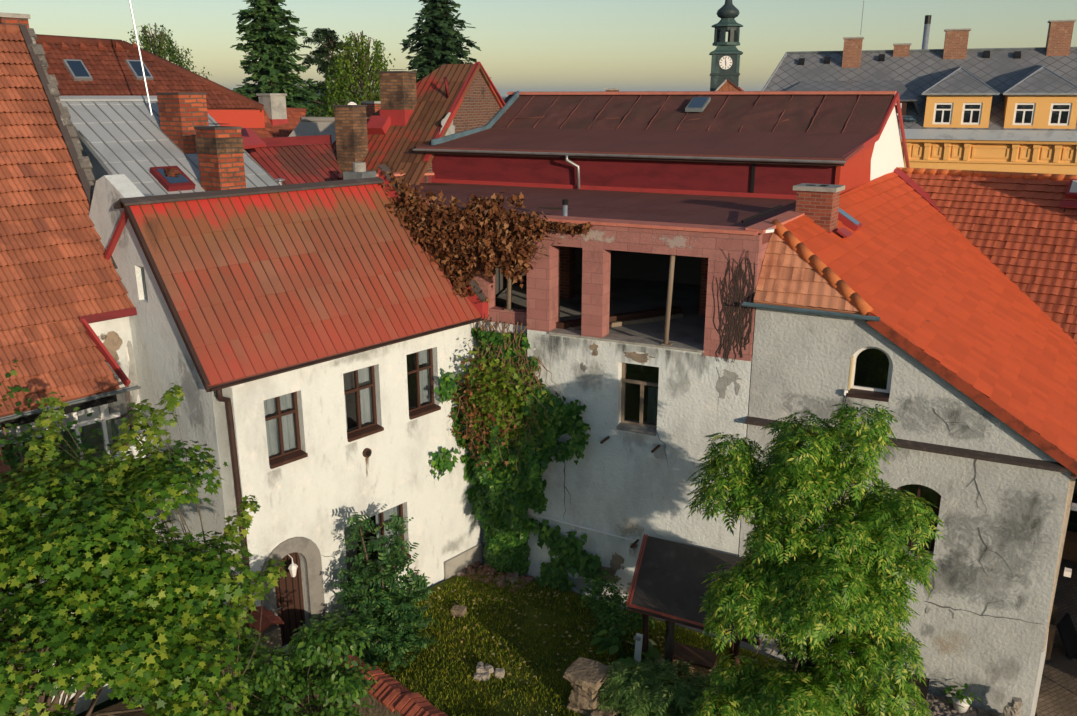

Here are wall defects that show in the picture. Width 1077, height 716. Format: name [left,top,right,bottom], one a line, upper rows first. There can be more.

flaking render [716,369,742,399]
crack [967,459,1011,575]
crack [926,565,1038,624]